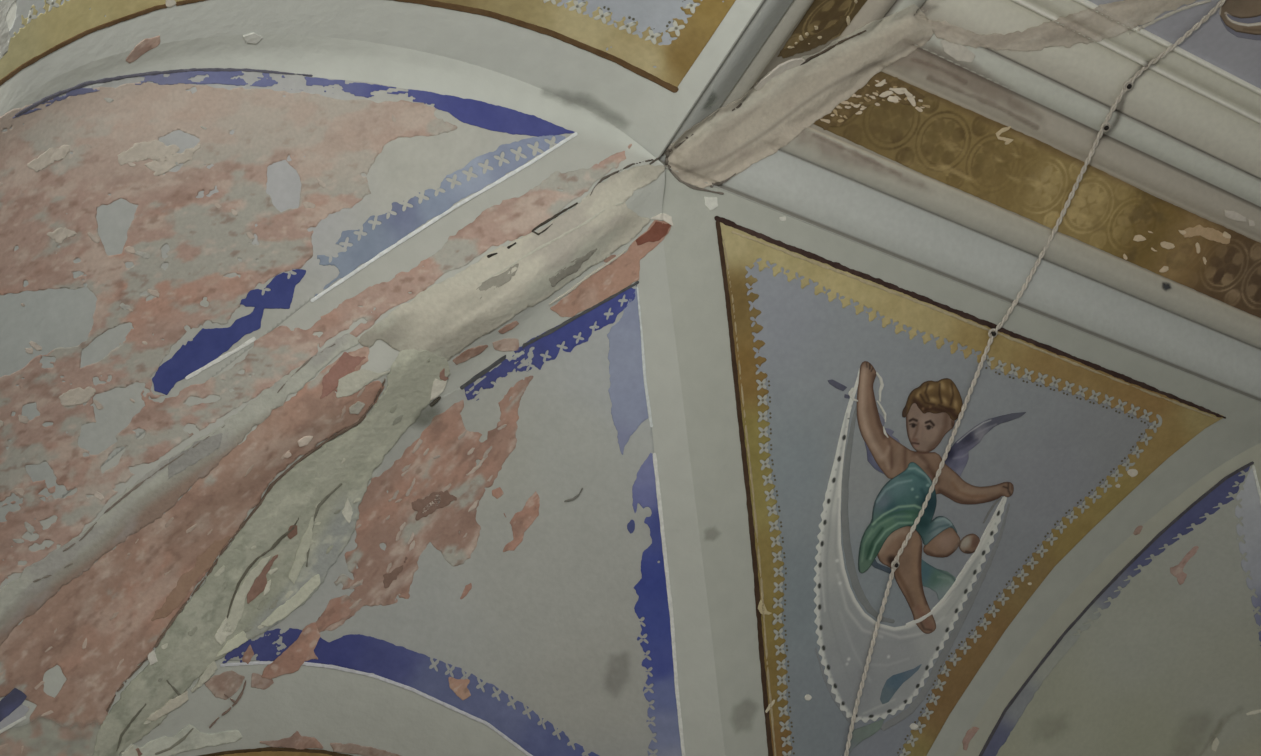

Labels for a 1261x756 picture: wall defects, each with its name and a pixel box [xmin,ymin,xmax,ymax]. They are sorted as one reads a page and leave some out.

peeling [0,0,16,59]
spalling [753,16,866,91]
peeling [820,79,930,123]
crack [487,134,736,258]
peeling [549,213,673,317]
peeling [1133,230,1207,265]
peeling [0,82,632,756]